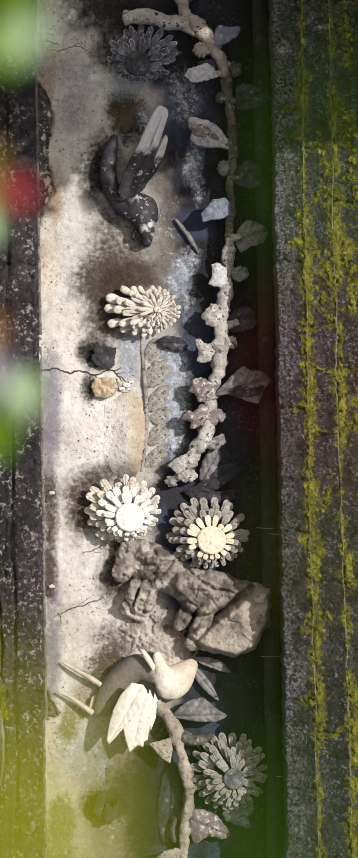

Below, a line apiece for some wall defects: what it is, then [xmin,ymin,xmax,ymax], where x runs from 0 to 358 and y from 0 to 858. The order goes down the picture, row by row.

crack [40,367,135,382]